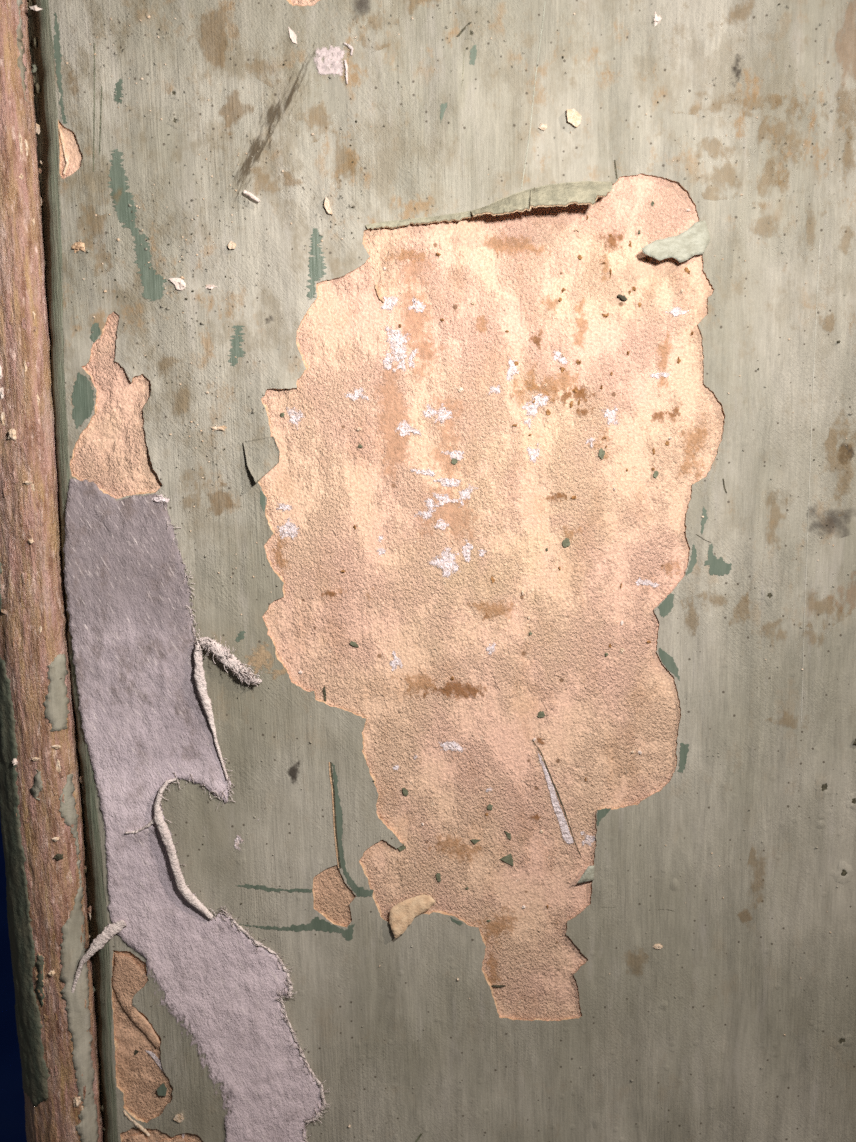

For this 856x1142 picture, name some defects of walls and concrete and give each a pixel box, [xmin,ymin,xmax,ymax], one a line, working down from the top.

peeling [71,312,162,498]
peeling [243,174,725,1021]
peeling [112,950,203,1142]